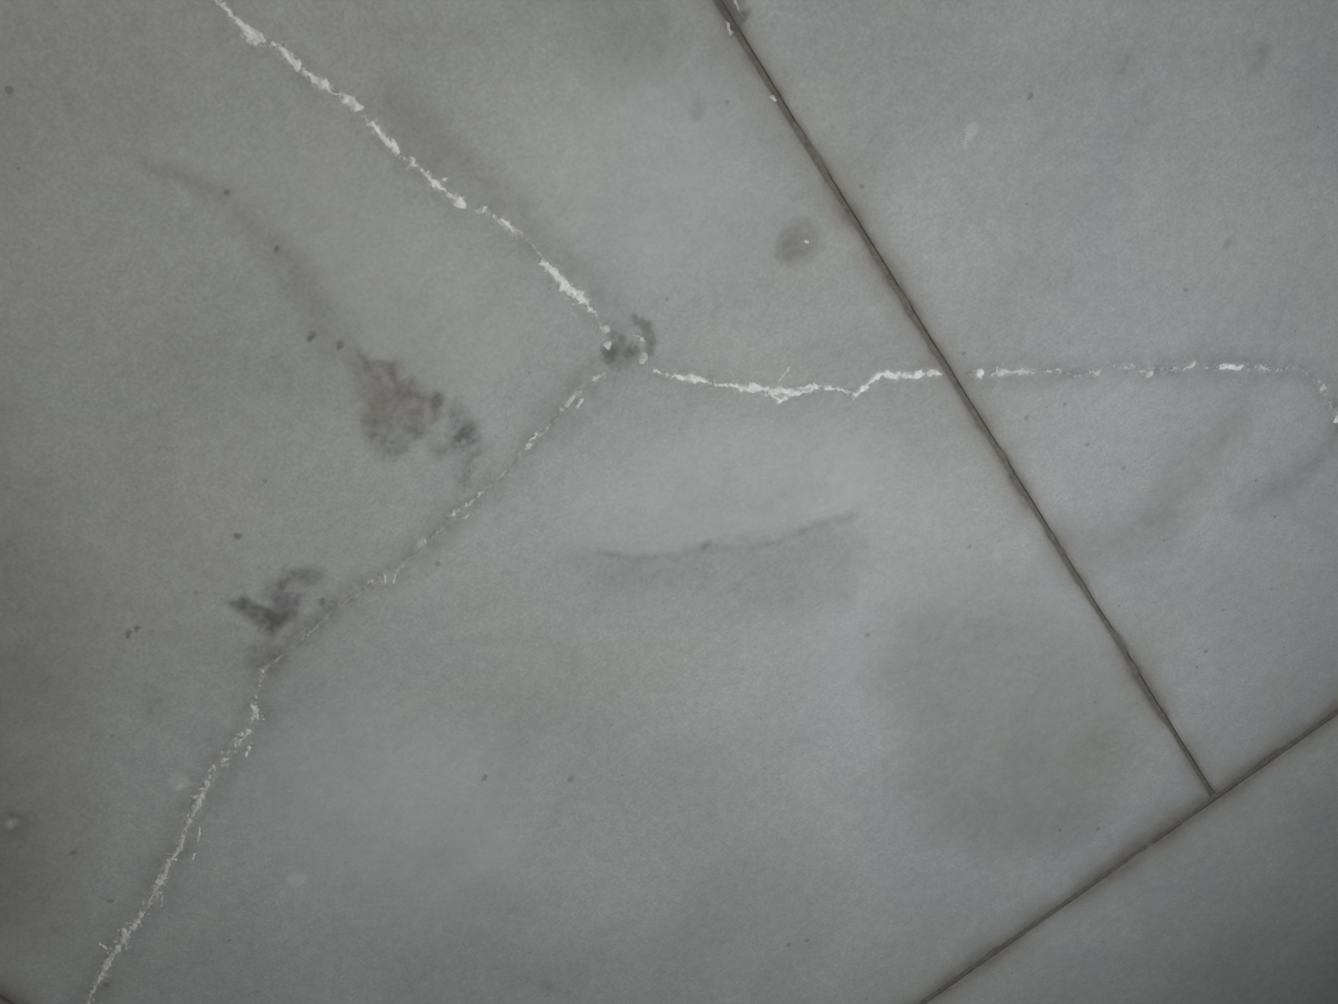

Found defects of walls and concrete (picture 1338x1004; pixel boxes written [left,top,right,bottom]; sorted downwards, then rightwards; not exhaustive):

crack [215,0,601,324]
crack [651,360,1338,423]
crack [86,367,610,1004]